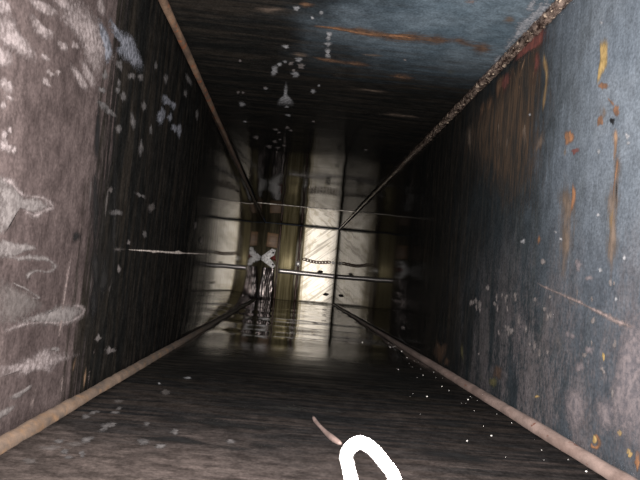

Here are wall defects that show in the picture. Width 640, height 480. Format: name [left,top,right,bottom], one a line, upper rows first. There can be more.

rust [315,26,489,52]
rust [598,43,607,89]
rust [597,101,619,260]